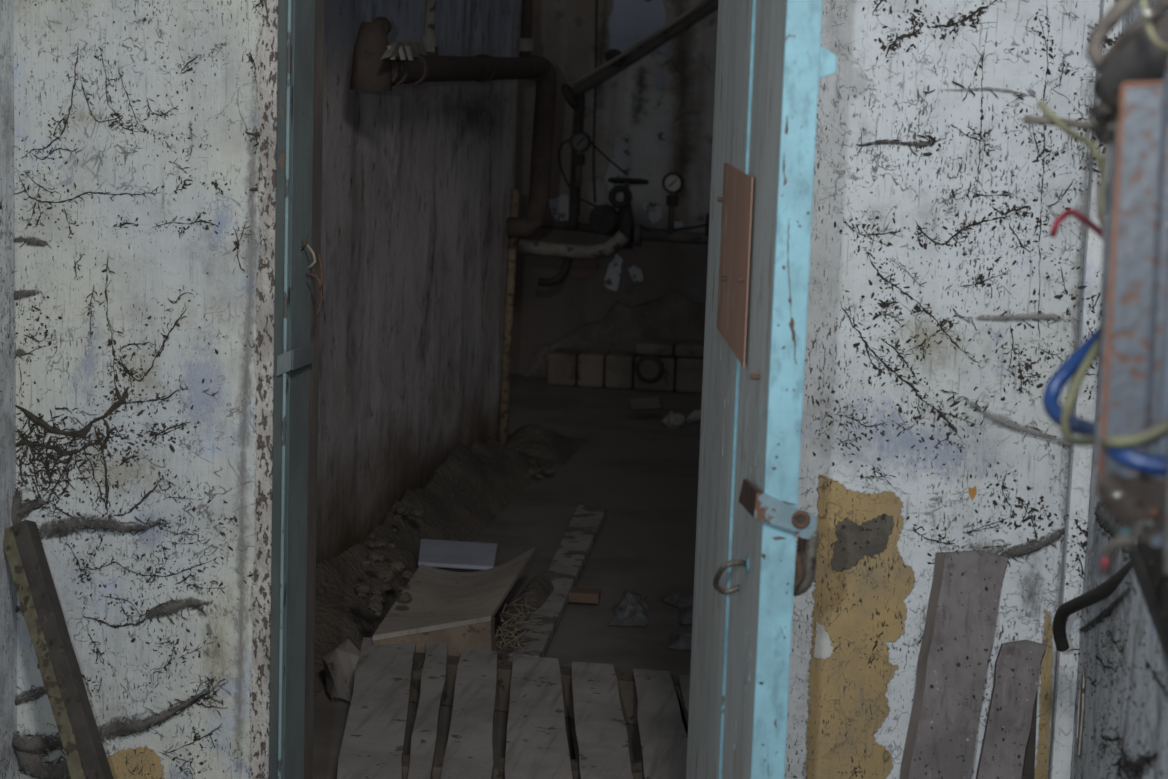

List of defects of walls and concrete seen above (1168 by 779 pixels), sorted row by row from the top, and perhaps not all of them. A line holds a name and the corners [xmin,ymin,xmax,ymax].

peeling [777,211,810,363]
peeling [805,474,915,779]
peeling [107,744,166,779]